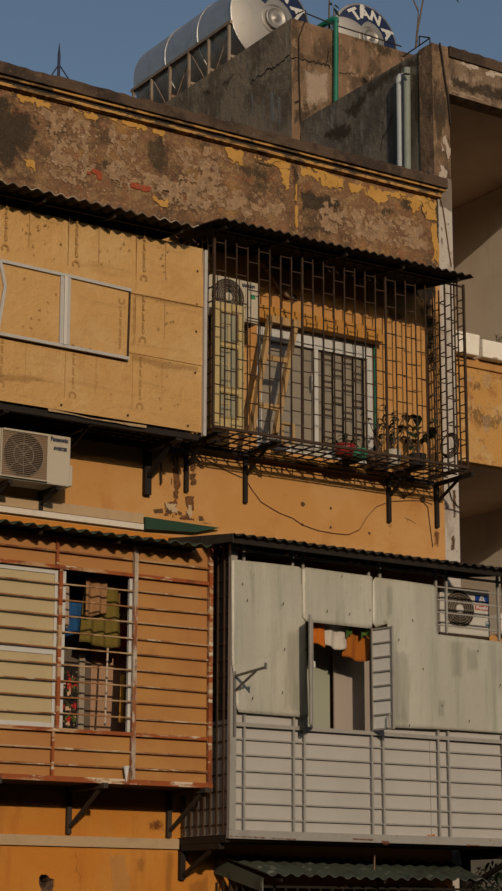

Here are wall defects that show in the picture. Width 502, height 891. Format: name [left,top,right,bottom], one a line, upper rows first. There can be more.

crack [250,51,356,84]
peeling [460,61,502,78]
leakage [0,97,39,174]
flaking render [12,92,439,263]
peeling [439,136,451,178]
flaking render [164,456,204,520]